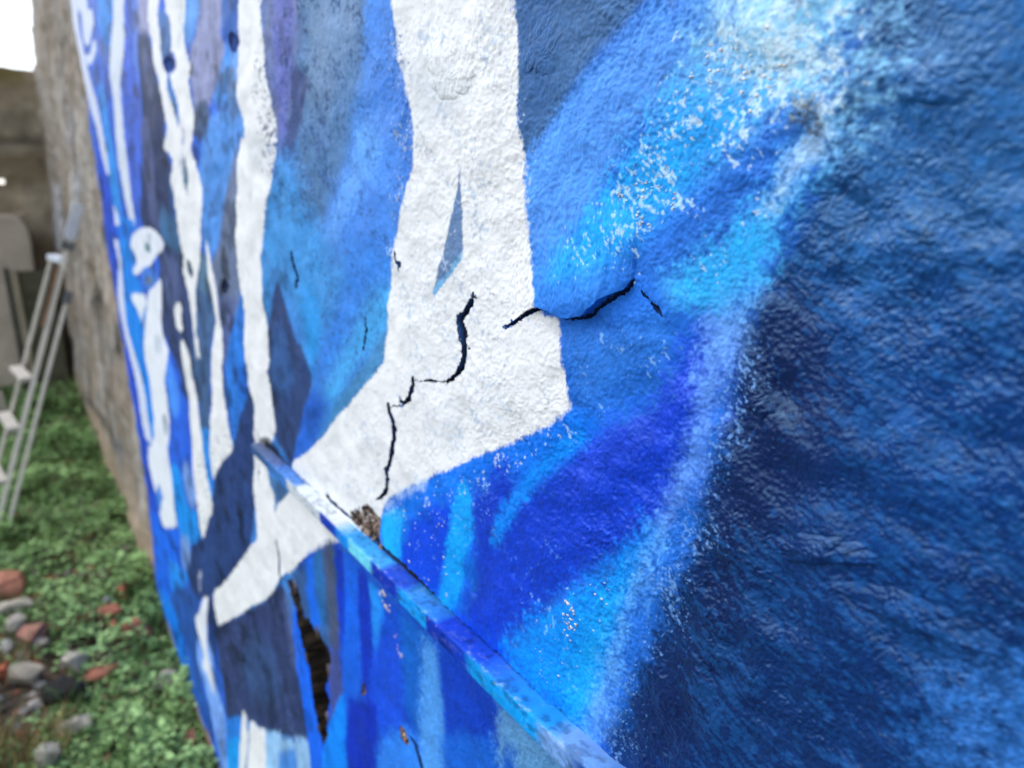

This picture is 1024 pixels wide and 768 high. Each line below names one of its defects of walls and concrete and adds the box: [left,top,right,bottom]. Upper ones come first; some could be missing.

crack [502,277,663,329]
crack [377,292,477,500]
spalling [350,504,382,550]
spalling [284,577,331,744]